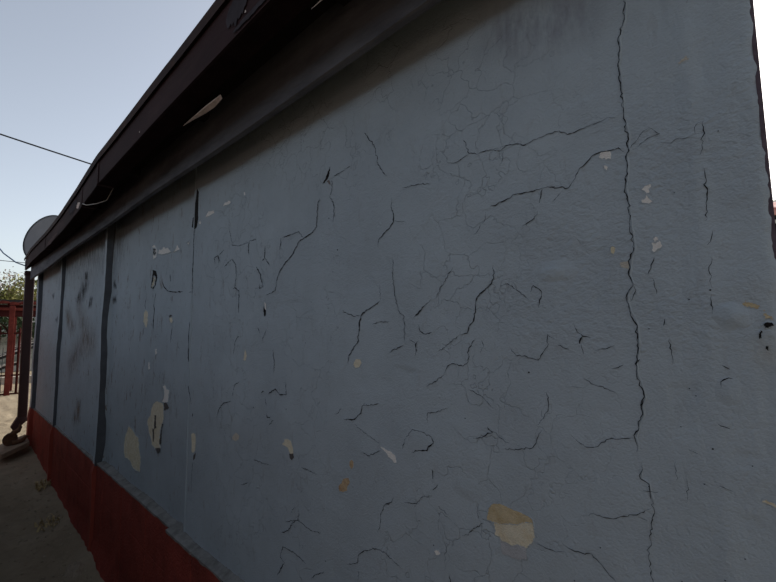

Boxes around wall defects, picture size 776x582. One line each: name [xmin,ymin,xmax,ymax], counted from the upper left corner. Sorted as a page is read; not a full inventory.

crack [143,239,194,334]
crack [214,166,350,312]
crack [344,259,542,383]
crack [457,0,713,580]
peeling [147,383,170,453]
crack [402,408,446,453]
crack [277,507,324,579]
spalling [486,502,536,560]